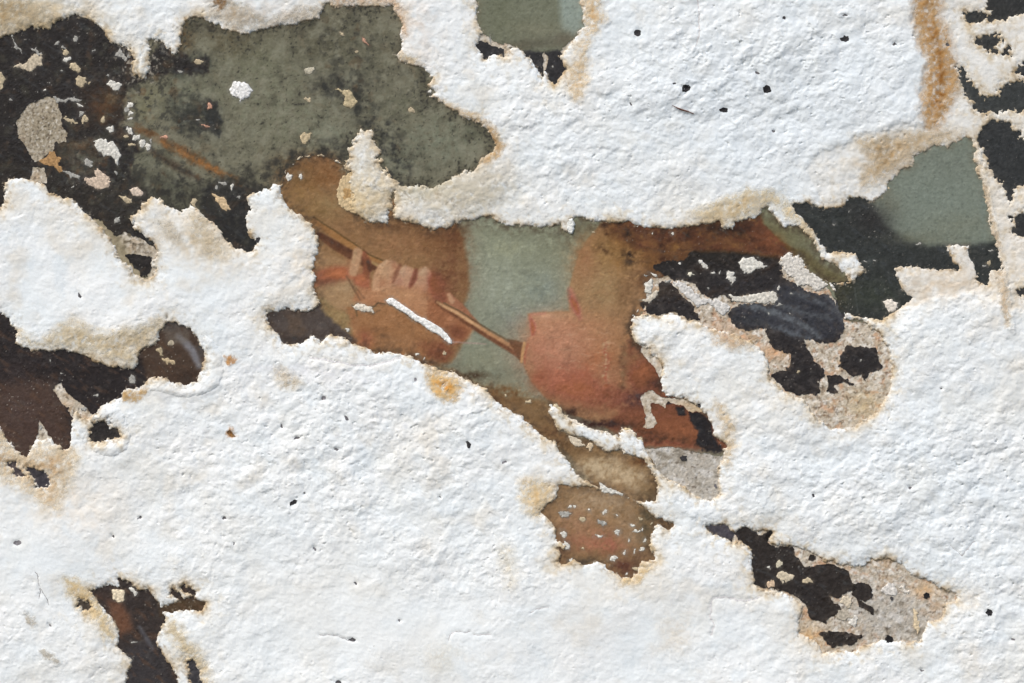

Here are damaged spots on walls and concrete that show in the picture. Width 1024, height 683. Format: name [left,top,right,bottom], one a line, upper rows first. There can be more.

peeling [476,0,585,84]
peeling [963,0,1024,23]
peeling [975,32,1012,57]
peeling [955,61,1024,116]
peeling [0,3,496,280]
peeling [977,120,1024,201]
peeling [1008,213,1024,237]
peeling [266,137,1004,579]
peeling [0,313,205,488]
peeling [77,578,205,683]
peeling [705,524,957,653]